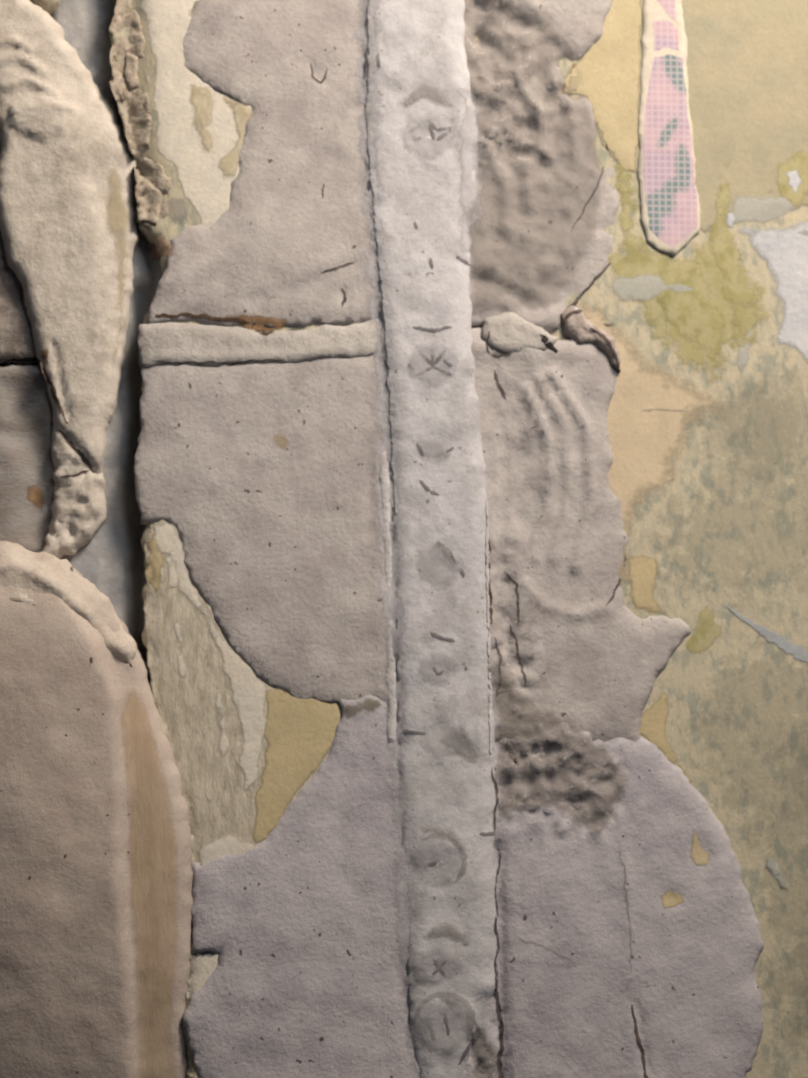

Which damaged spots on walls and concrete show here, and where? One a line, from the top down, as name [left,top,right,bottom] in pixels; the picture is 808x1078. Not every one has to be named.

peeling [108,0,253,231]
peeling [564,0,644,172]
peeling [681,0,808,360]
corrosion [227,315,297,335]
crack [0,357,95,478]
peeling [560,304,720,613]
peeling [144,520,342,868]
crack [485,541,527,696]
peeling [640,693,691,783]
peeling [187,949,219,999]
crack [491,743,520,1078]
crack [631,1005,648,1078]